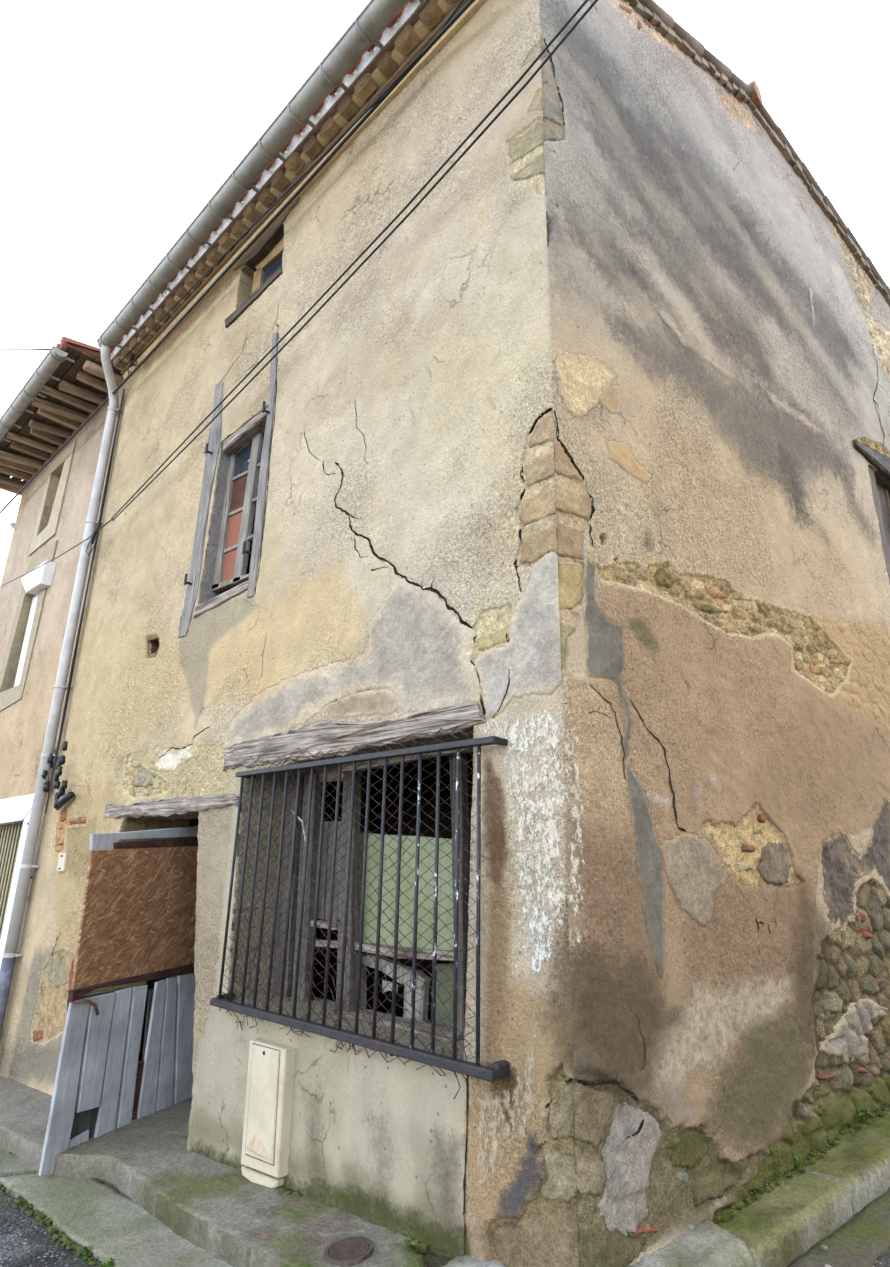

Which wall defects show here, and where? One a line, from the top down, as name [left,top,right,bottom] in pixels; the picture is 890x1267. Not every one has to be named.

flaking render [794,172,890,383]
crack [218,315,279,590]
crack [304,408,510,718]
flaking render [516,407,850,694]
leakage [621,310,855,515]
flaking render [857,438,890,458]
crack [589,684,687,832]
flaking render [700,803,802,889]
flaking render [32,949,76,1043]
flaking render [789,879,890,1133]
flaking render [464,1014,767,1267]